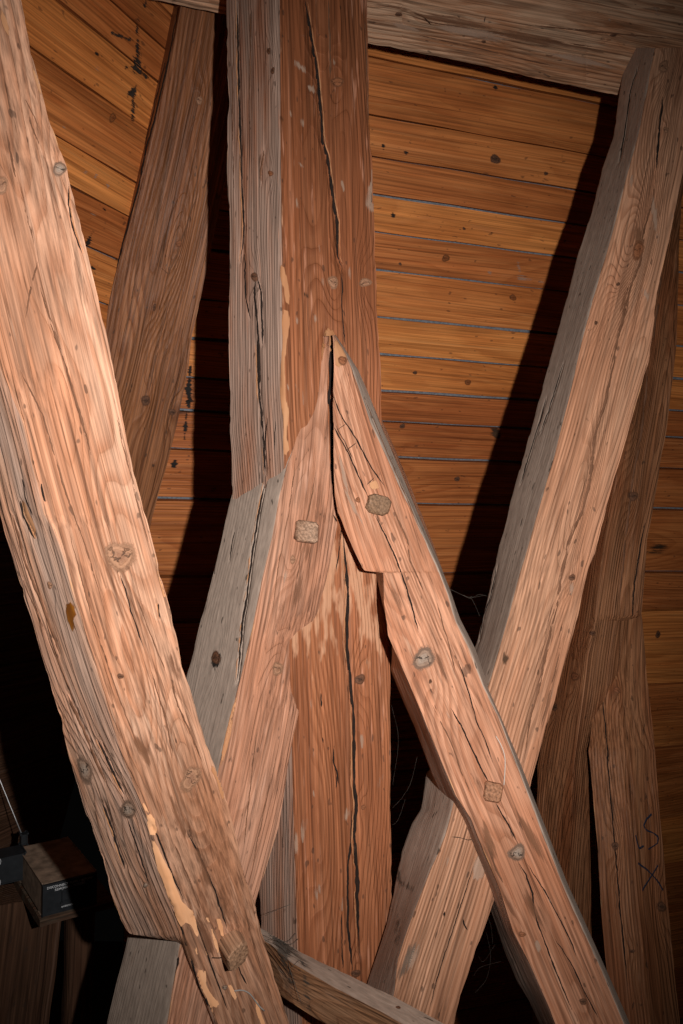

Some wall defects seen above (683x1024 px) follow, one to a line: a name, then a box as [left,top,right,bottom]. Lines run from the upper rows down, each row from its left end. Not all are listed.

crack [230,0,493,970]
peeling [143,803,224,955]
peeling [197,969,219,1013]